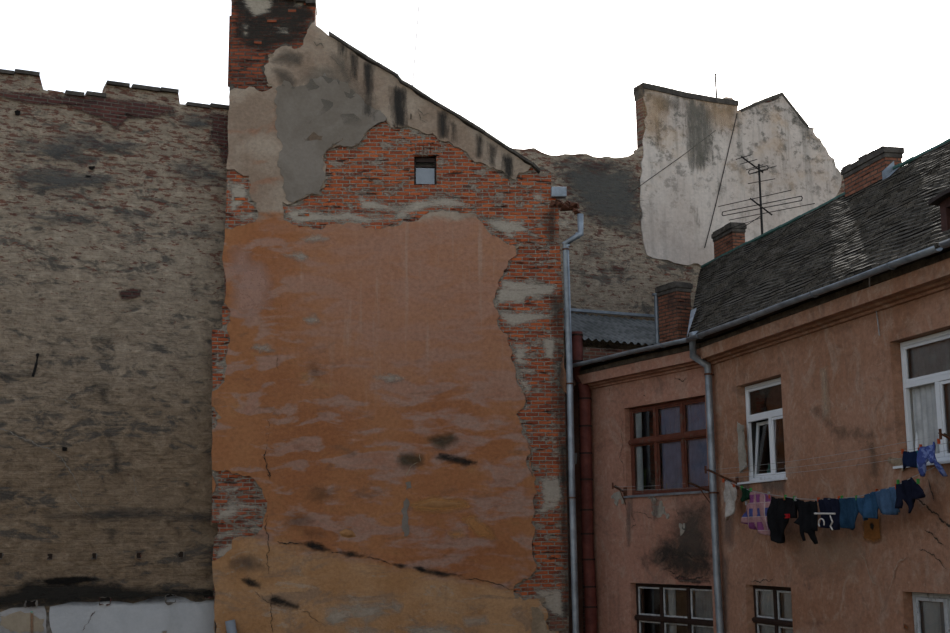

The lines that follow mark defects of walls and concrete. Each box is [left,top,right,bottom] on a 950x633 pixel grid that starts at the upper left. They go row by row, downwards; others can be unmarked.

flaking render [229,0,316,92]
leakage [341,45,373,108]
leakage [393,90,405,125]
leakage [438,112,454,137]
leakage [477,136,513,178]
leakage [654,97,733,167]
flaking render [225,170,258,230]
flaking render [283,121,569,631]
flaking render [212,468,267,561]
leakage [653,506,708,563]
crack [916,480,950,569]